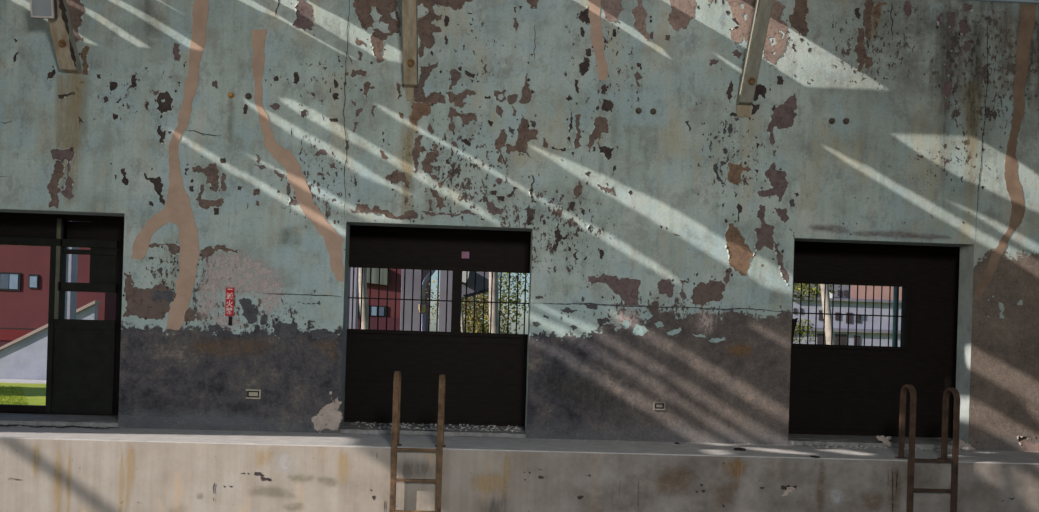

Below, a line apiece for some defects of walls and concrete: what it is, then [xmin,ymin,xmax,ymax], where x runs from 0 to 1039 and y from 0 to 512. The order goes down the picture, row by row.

peeling [291,0,315,36]
peeling [851,0,888,73]
peeling [321,0,401,150]
peeling [350,0,756,231]
peeling [47,147,76,208]
peeling [656,0,811,343]
peeling [148,243,180,260]
peeling [199,245,239,260]
peeling [527,216,587,260]
peeling [122,272,176,321]
peeling [560,272,664,336]
spalling [309,391,343,433]